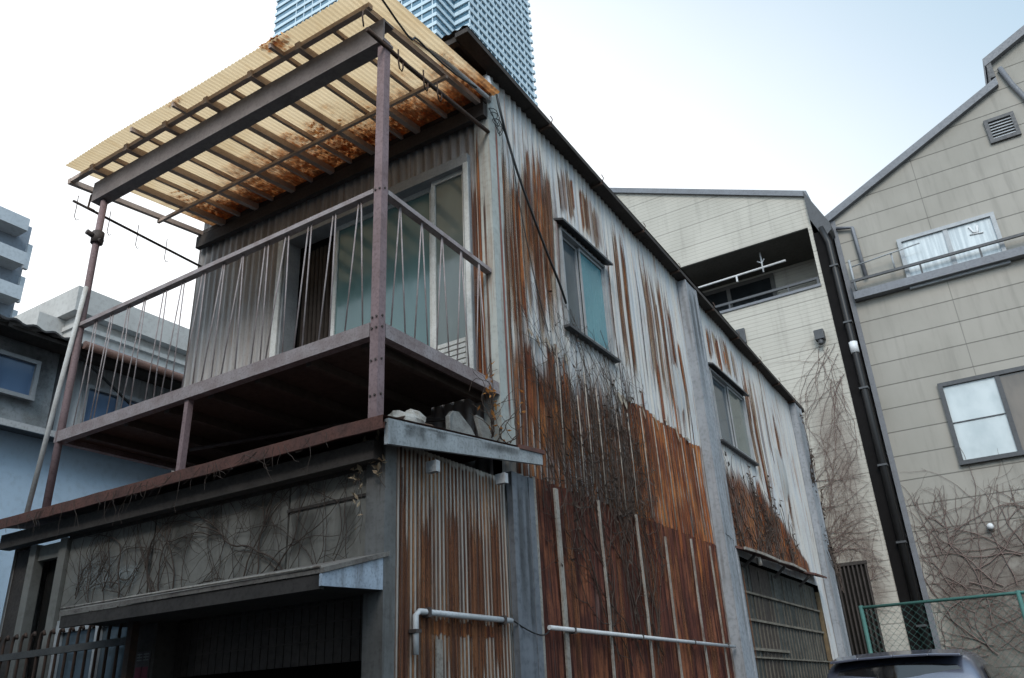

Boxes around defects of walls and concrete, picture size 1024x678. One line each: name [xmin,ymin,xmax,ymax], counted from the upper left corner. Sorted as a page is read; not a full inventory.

corrosion [394,447,511,678]
corrosion [495,131,735,678]
corrosion [706,330,811,577]